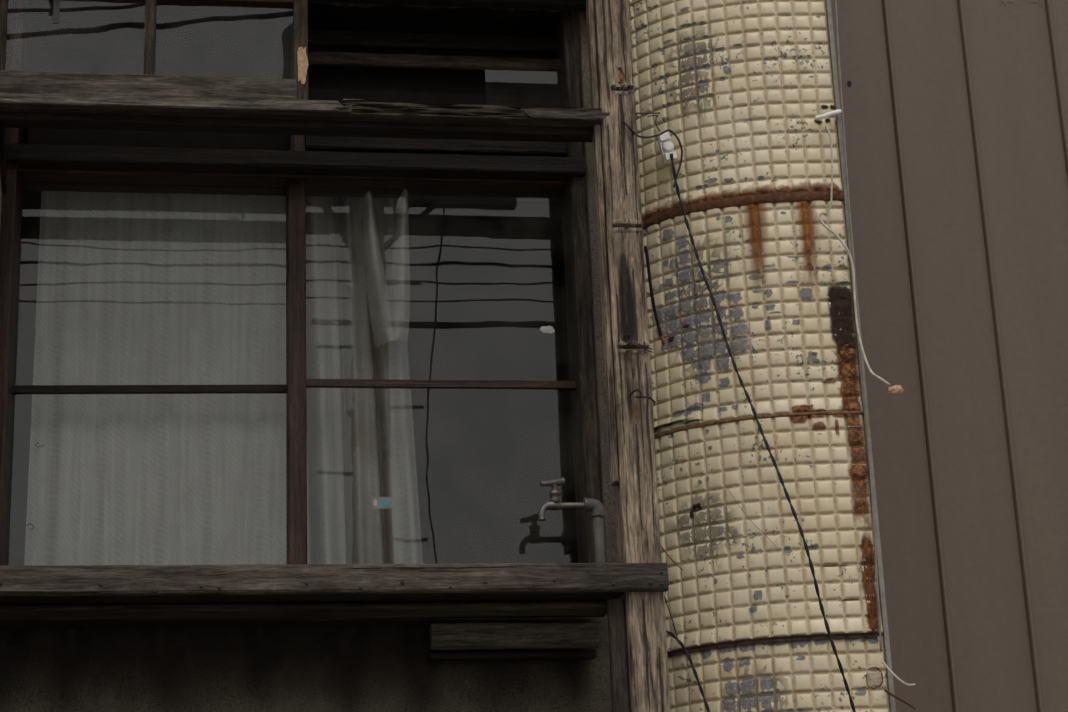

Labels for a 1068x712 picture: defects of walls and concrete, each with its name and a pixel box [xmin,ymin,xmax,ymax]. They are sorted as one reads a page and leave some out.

peeling [658,7,742,88]
peeling [660,73,672,121]
peeling [696,178,733,190]
corrosion [642,183,839,265]
peeling [656,229,782,417]
peeling [786,280,813,301]
corrosion [654,419,702,433]
corrosion [791,286,869,516]
peeling [749,590,763,613]
corrosion [667,535,879,658]
peeling [701,634,879,712]